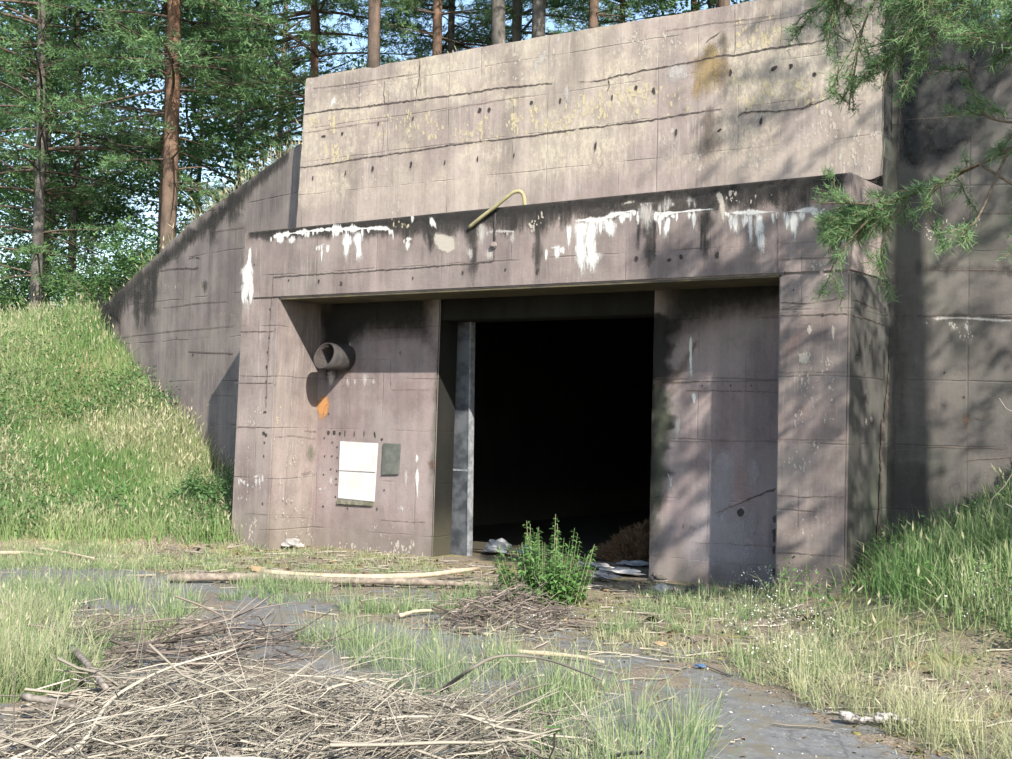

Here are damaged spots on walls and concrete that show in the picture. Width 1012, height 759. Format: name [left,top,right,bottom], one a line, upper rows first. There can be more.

water stain [883,18,1002,164]
water stain [98,152,289,332]
water stain [240,173,844,307]
water stain [865,175,888,212]
corrosion [317,396,329,418]